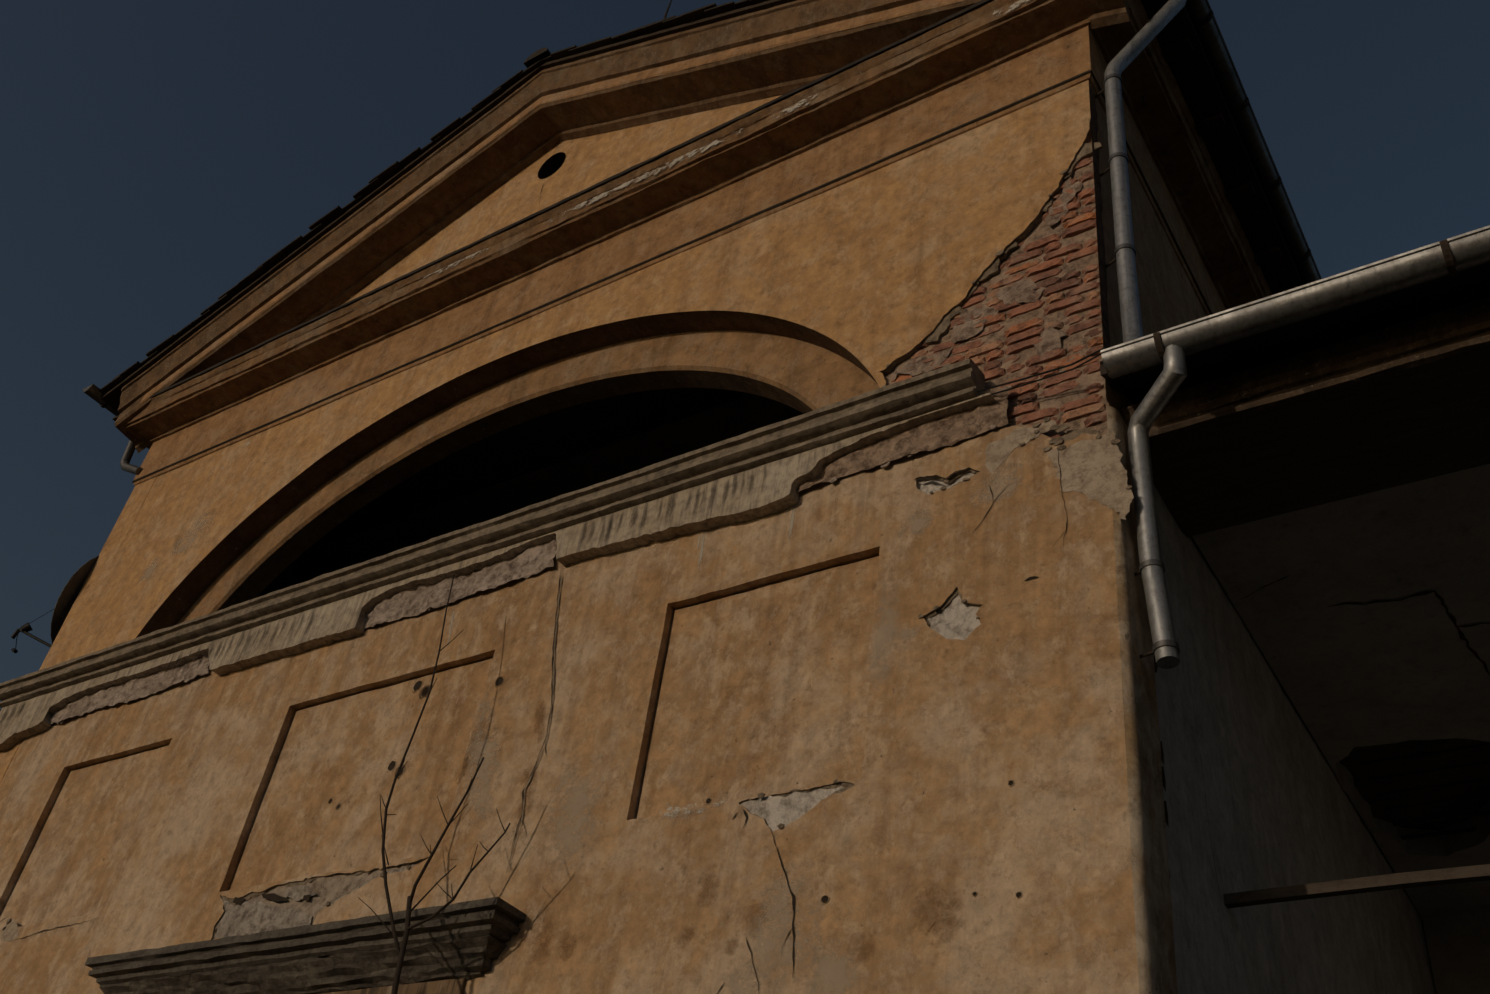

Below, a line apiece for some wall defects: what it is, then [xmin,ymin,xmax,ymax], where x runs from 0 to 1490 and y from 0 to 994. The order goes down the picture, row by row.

spalling [797,136,1134,520]
spalling [918,589,981,640]
crack [1328,591,1490,675]
spalling [49,655,210,724]
spalling [641,779,855,831]
spalling [212,862,421,940]
crack [717,809,795,994]